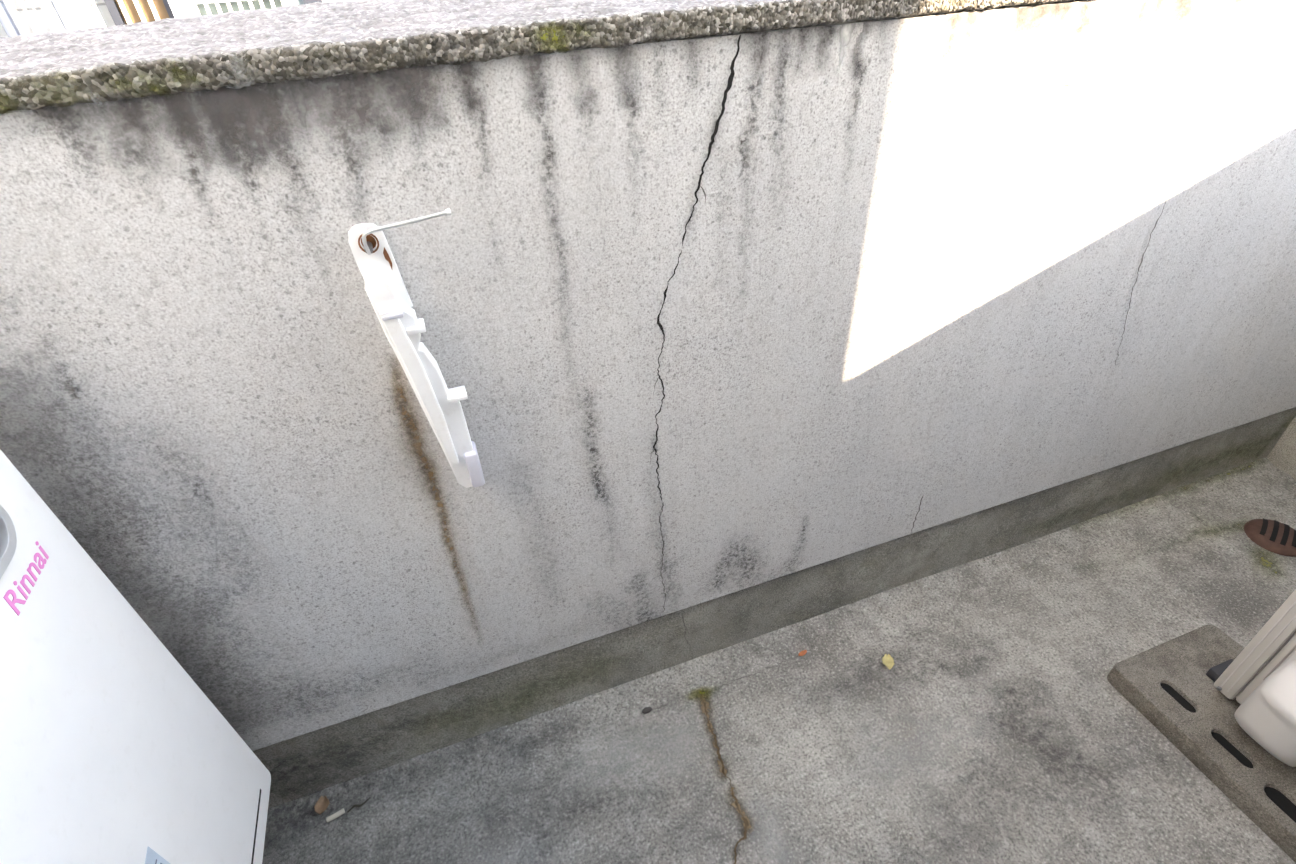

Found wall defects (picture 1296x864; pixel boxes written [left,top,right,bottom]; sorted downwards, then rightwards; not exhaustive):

damp [117,66,436,191]
damp [455,62,489,171]
damp [527,54,566,282]
damp [740,22,868,172]
damp [945,11,980,56]
damp [1014,2,1093,116]
crack [650,35,741,659]
rust [396,378,468,604]
damp [584,397,605,497]
crack [644,660,788,864]